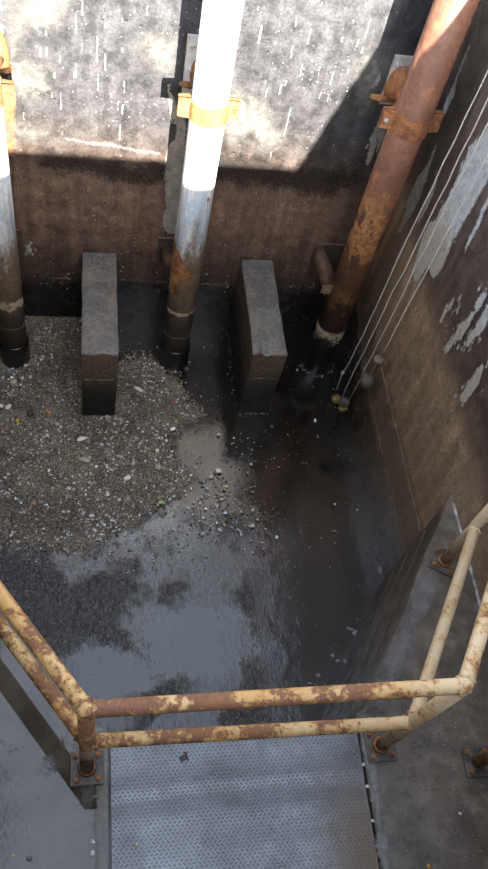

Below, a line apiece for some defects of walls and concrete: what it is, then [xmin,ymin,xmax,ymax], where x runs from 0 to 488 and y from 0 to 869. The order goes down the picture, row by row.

water stain [41,148,166,184]
water stain [217,81,358,197]
peeling [397,127,488,287]
peeling [439,286,488,354]